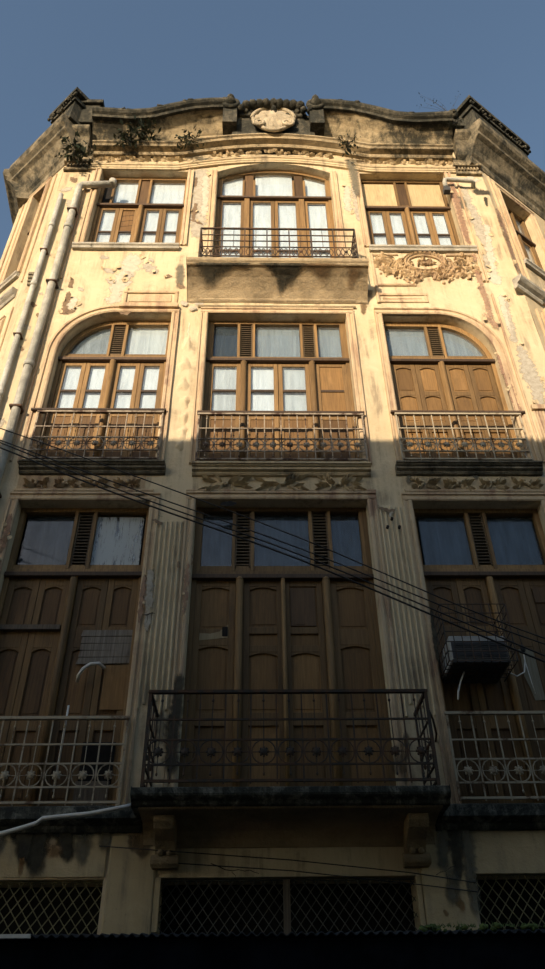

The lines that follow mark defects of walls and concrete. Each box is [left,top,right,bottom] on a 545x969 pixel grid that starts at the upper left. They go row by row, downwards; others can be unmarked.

peeling [183,168,211,238]
peeling [57,276,84,314]
peeling [100,253,204,315]
damp [176,265,185,288]
damp [196,262,333,292]
damp [347,266,363,285]
peeling [450,176,545,404]
damp [0,833,112,877]
damp [436,830,480,914]